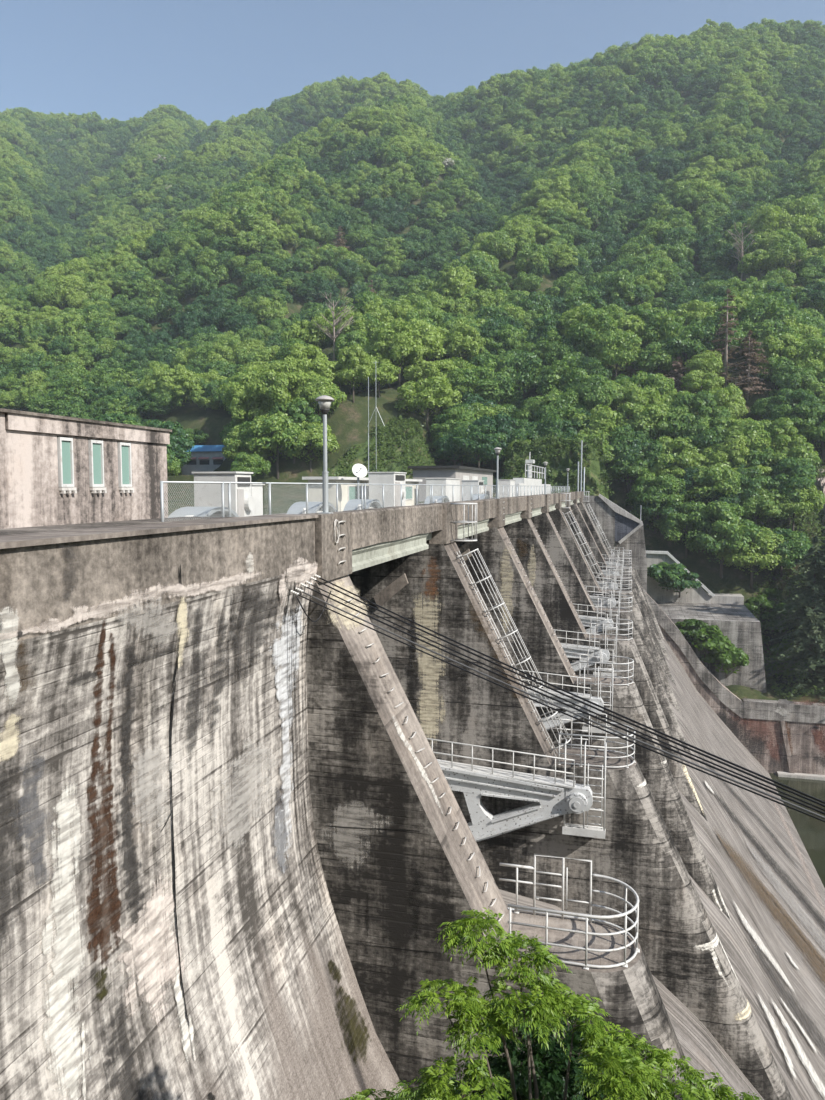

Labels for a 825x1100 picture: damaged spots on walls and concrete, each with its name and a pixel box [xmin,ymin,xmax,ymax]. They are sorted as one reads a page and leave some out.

damp [0,607,91,1100]
damp [68,671,97,685]
corrosion [87,621,121,962]
crack [162,655,189,1028]
damp [102,591,303,1100]
damp [328,805,387,868]